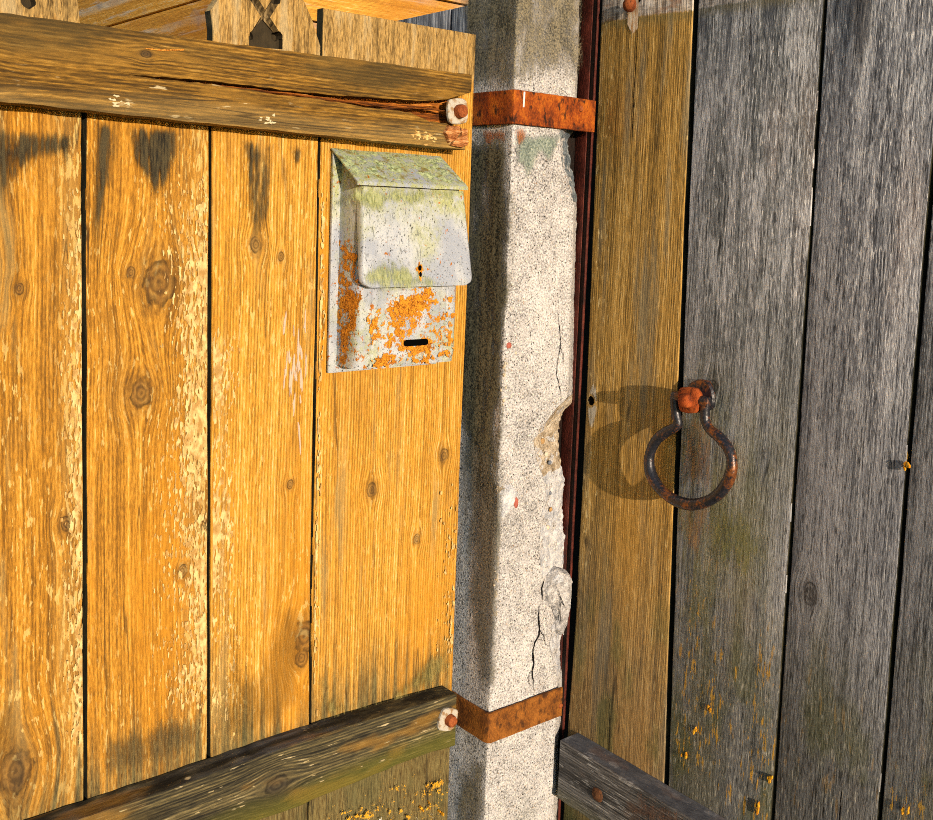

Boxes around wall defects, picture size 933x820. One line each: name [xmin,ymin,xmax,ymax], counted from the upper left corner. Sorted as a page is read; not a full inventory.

water stain [0,131,68,186]
water stain [97,125,113,222]
water stain [133,128,176,189]
crack [158,78,452,126]
water stain [517,137,556,172]
rust [336,238,457,371]
peeling [152,176,242,737]
water stain [462,134,514,687]
spalling [534,395,572,577]
crack [529,579,546,686]